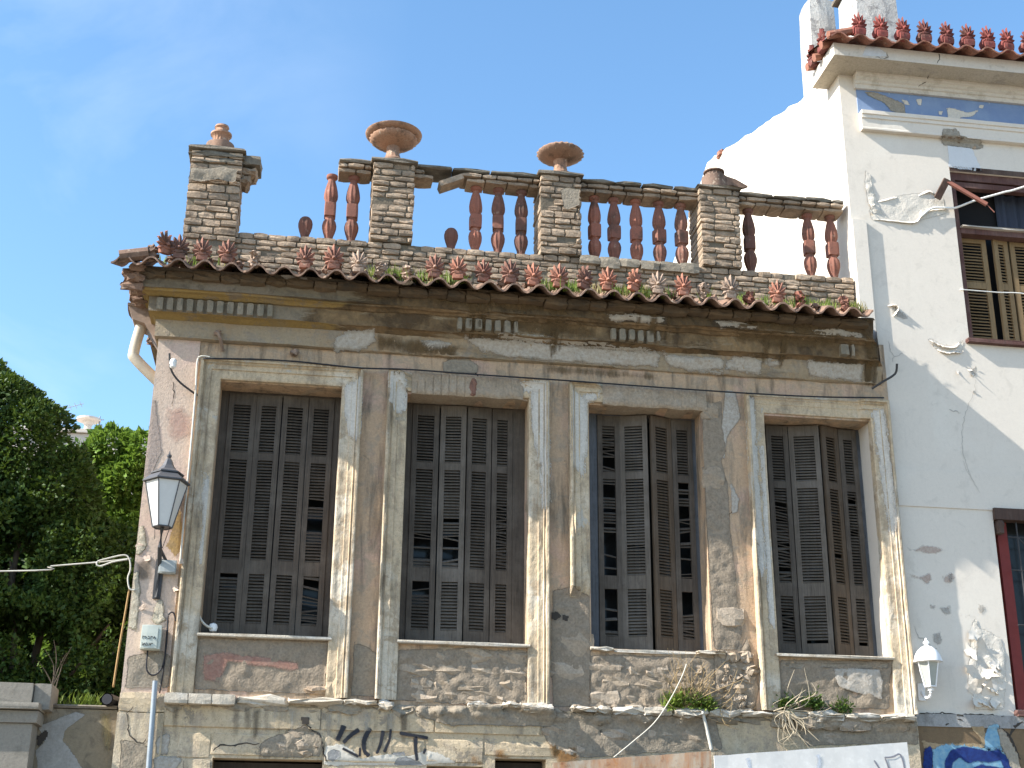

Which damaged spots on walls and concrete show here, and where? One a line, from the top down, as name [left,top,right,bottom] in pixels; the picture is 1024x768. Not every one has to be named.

peeling [865,92,922,113]
peeling [939,105,984,149]
peeling [334,328,376,353]
peeling [421,332,781,376]
peeling [928,338,964,354]
spalling [568,384,775,711]
flaking render [195,636,328,695]
spalling [412,586,594,727]
flaking render [780,659,893,710]
flaking render [964,606,1006,710]